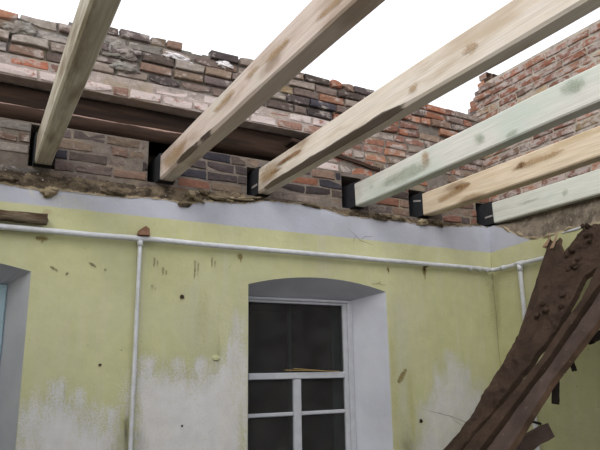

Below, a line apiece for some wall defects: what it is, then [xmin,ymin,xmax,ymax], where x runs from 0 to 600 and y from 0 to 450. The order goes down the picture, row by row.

spalling [0,168,488,228]